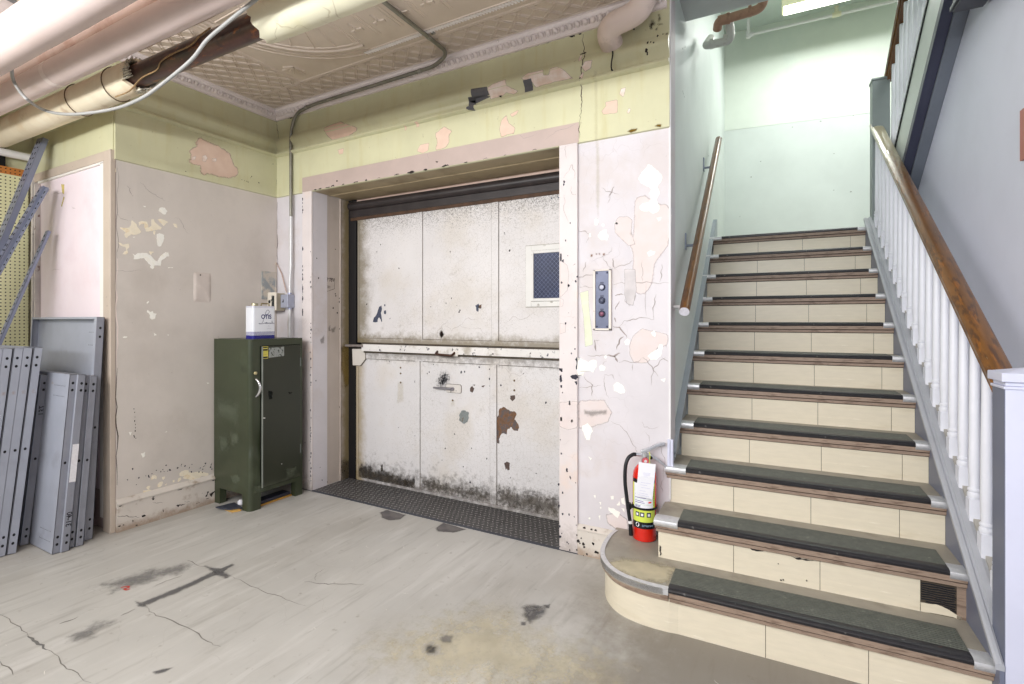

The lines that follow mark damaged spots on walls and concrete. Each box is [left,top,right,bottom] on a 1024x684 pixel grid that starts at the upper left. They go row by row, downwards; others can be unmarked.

peeling [488,52,592,99]
peeling [185,138,259,183]
peeling [119,207,177,269]
crack [520,38,667,398]
damp [341,346,349,385]
rust [497,395,519,443]
damp [342,462,415,488]
crack [0,614,91,683]
crack [147,607,221,647]